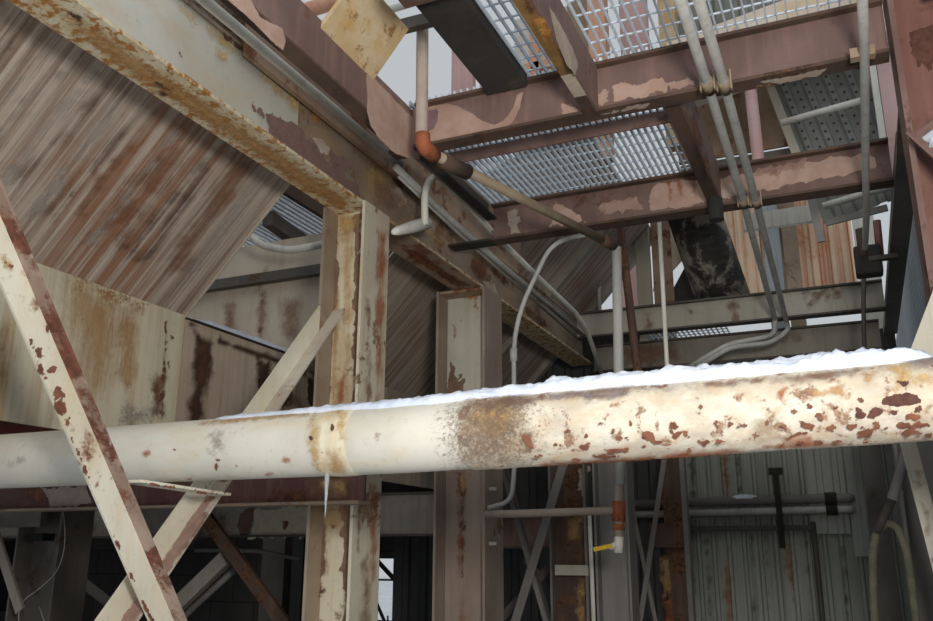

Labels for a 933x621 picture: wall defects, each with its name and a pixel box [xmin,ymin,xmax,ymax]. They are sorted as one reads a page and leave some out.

peeling [598,77,694,106]
rust [68,12,356,233]
peeling [252,101,360,198]
peeling [599,179,707,215]
peeling [720,153,877,199]
peeling [351,213,362,403]
rust [29,339,57,380]
rust [53,386,71,427]
rust [125,377,163,424]
rust [486,397,532,409]
rust [791,386,844,421]
peeling [338,505,350,621]